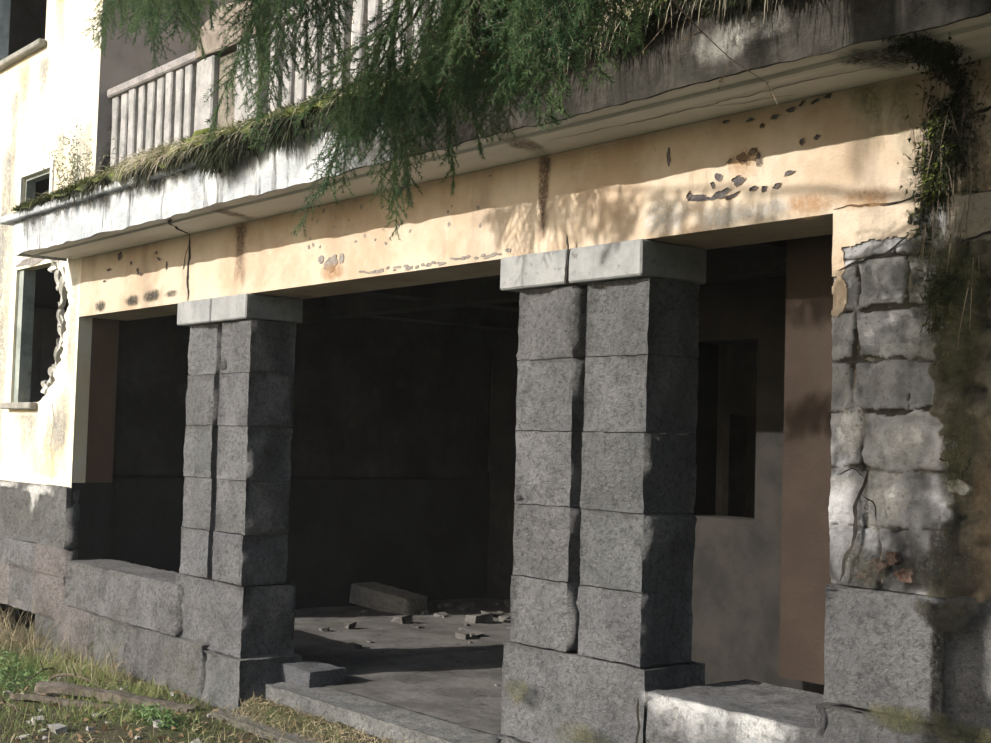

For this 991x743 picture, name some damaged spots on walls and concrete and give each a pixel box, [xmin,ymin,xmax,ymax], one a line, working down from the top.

peeling [745,93,833,128]
crack [966,105,991,117]
damp [510,140,550,231]
peeling [686,147,795,202]
damp [0,169,202,321]
crack [168,218,191,300]
damp [218,210,245,269]
spalling [307,237,344,273]
peeling [359,248,511,274]
flaking render [16,258,68,395]
damp [28,396,66,501]
crack [839,468,876,581]